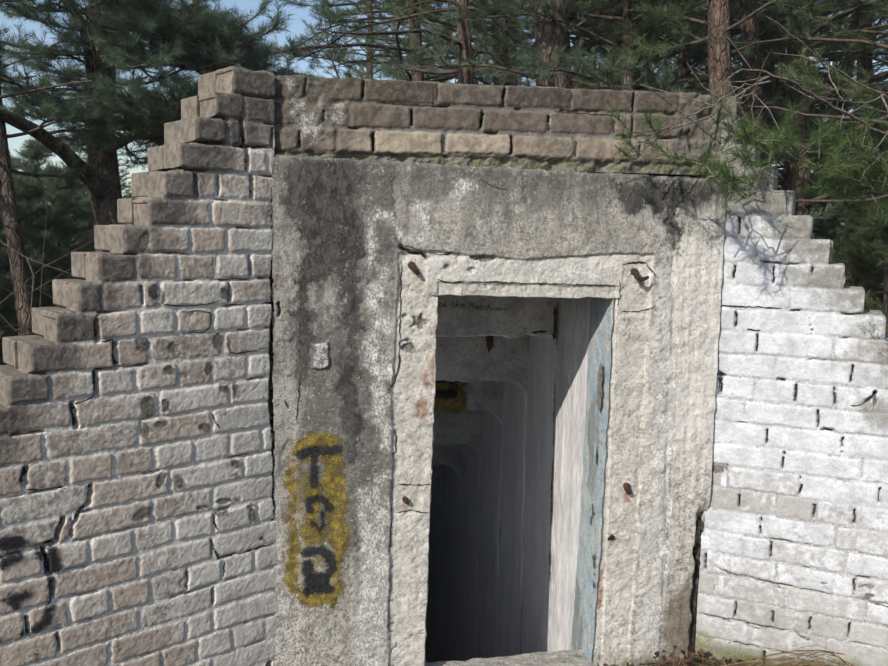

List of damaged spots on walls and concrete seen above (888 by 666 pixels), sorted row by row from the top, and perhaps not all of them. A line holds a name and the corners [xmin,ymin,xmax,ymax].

crack [20,467,66,490]
crack [36,484,91,567]
crack [69,320,118,426]
leakage [279,157,434,464]
leakage [327,475,395,666]
crack [387,477,431,638]
crack [388,237,452,390]
crack [531,306,558,345]
crack [438,261,656,312]
crack [548,385,556,526]
leakage [609,177,719,660]
crack [689,512,783,643]